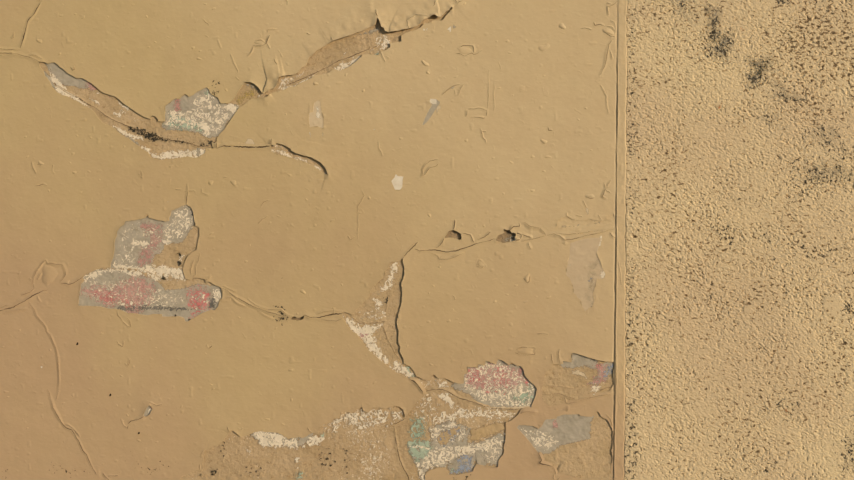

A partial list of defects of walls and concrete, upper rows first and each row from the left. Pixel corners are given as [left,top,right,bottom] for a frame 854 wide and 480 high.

crack [0,0,276,152]
peeling [73,200,227,326]
peeling [35,1,463,165]
peeling [246,136,333,180]
crack [113,0,622,480]
spalling [491,223,521,248]
crack [0,258,118,480]
peeling [173,252,620,480]